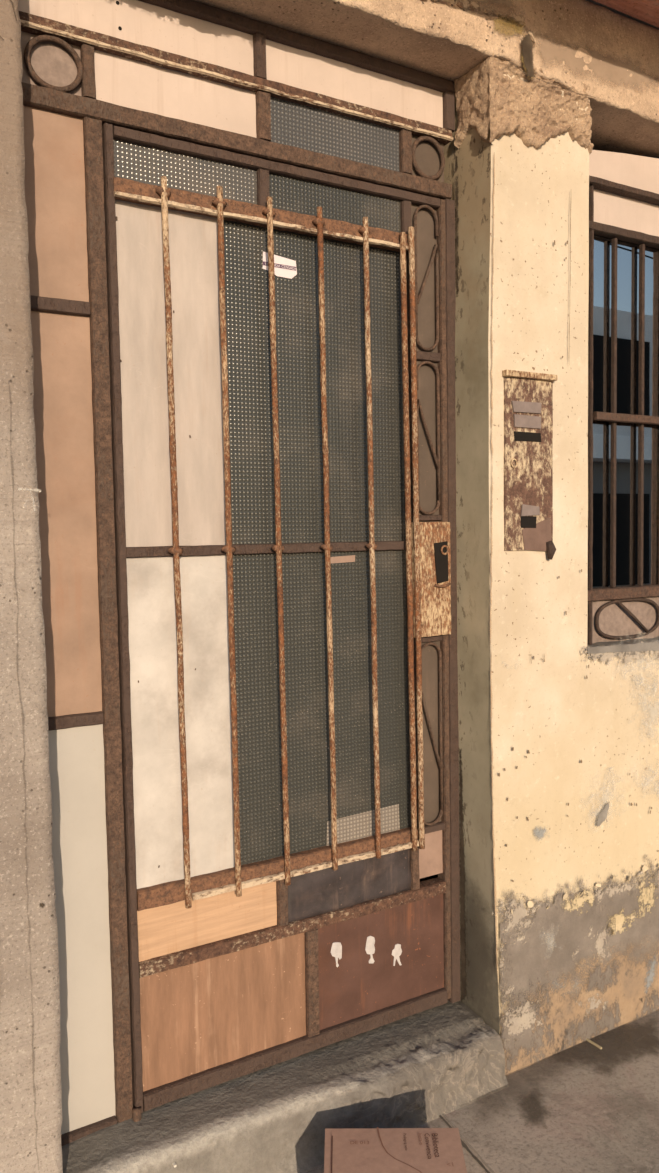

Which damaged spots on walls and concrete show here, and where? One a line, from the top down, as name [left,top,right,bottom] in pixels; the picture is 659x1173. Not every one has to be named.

spalling [454,0,594,297]
peeling [459,749,467,1001]
damp [521,1093,547,1122]
peeling [492,855,659,1076]
damp [554,1021,659,1072]